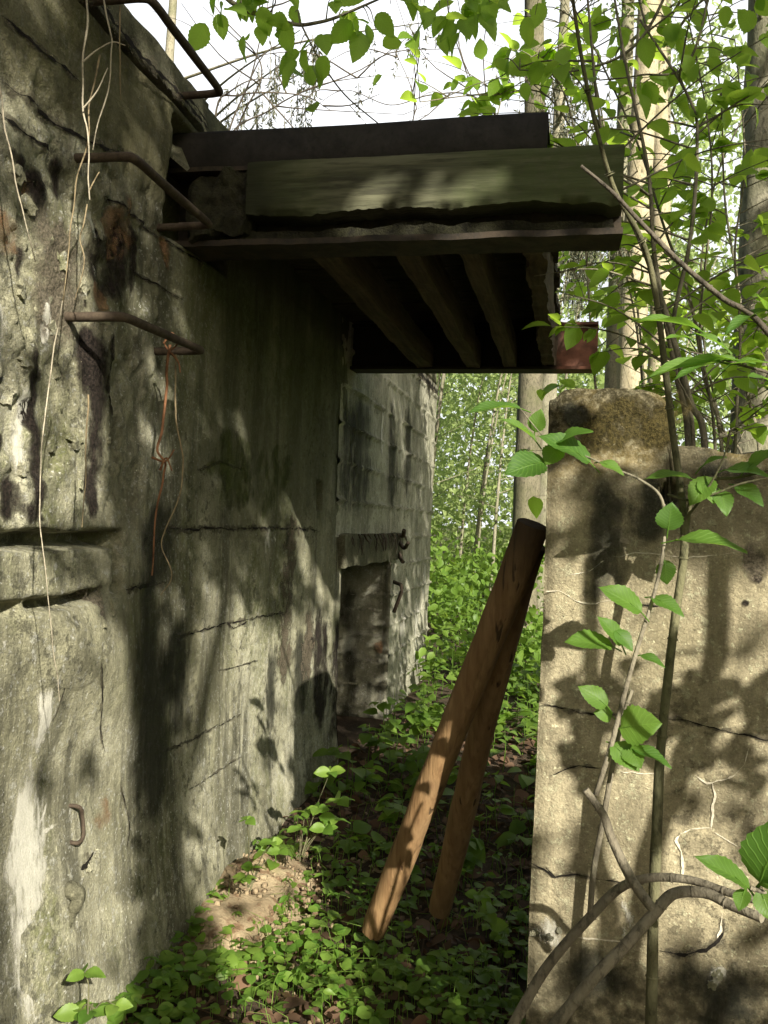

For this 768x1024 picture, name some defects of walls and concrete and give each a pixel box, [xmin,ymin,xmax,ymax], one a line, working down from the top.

water stain [74,325,115,517]
crack [166,524,316,534]
crack [126,582,166,594]
crack [170,611,284,641]
crack [542,703,617,716]
crack [167,714,241,751]
crack [191,757,241,789]
crack [653,714,768,875]
crack [531,863,619,884]
crack [578,935,620,943]
crack [662,918,726,958]